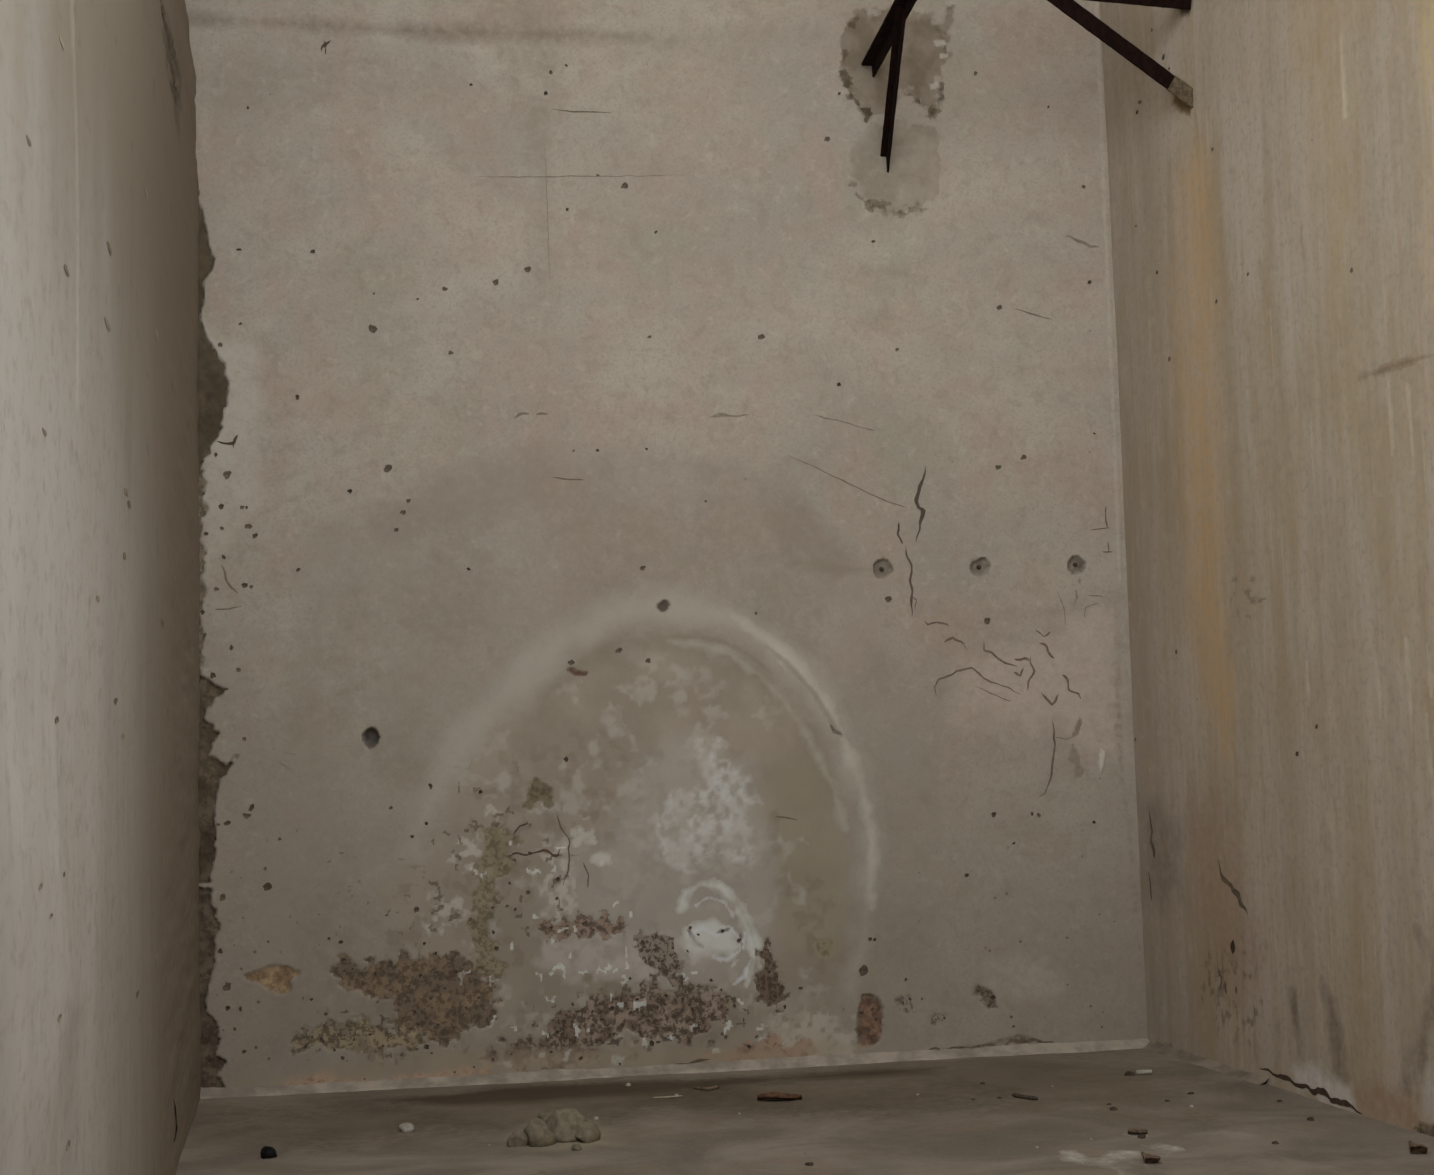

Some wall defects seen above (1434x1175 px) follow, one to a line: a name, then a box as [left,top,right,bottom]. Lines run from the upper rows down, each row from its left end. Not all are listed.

crack [1090,507,1112,553]
spalling [198,190,313,1088]
spalling [657,600,670,613]
crack [897,466,1104,797]
spalling [362,727,380,750]
spalling [521,777,554,812]
damp [183,432,1434,1172]
rust [1179,760,1284,1030]
spalling [287,823,736,1062]
spalling [721,929,803,1013]
spalling [855,978,947,1046]
crack [1260,1068,1362,1114]